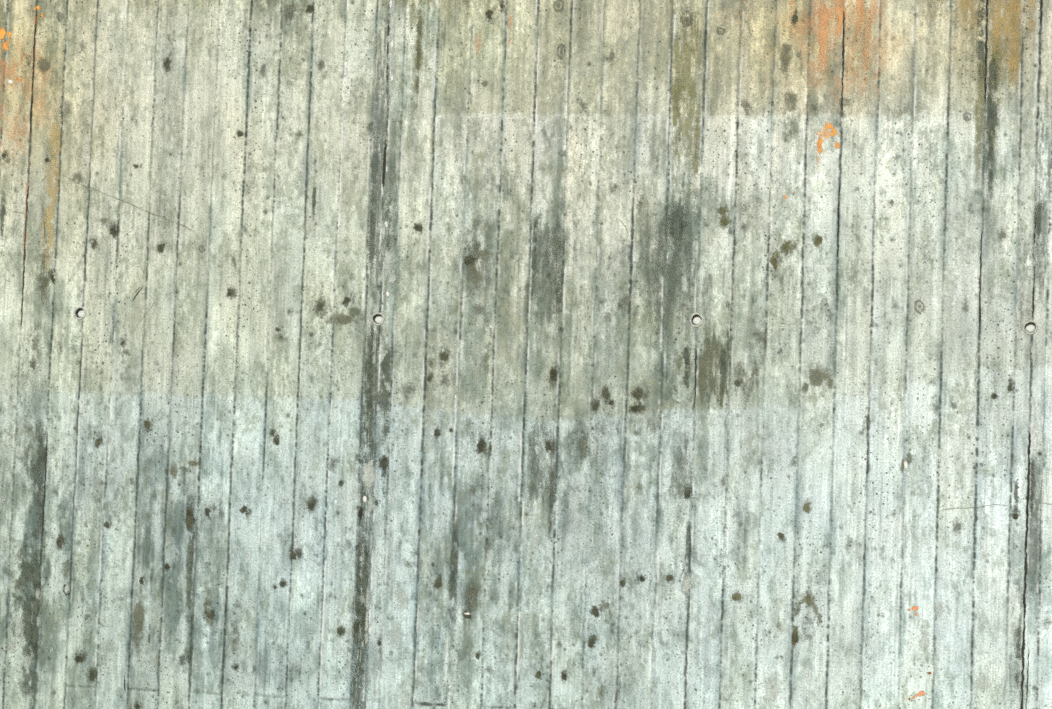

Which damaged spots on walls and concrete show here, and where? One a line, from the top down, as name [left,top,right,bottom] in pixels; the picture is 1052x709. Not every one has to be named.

rust [820,0,863,62]
rust [962,0,1034,190]
damp [368,34,395,280]
rust [817,123,840,154]
damp [531,216,561,313]
damp [655,205,691,283]
damp [315,297,358,324]
damp [676,332,758,407]
damp [25,428,46,506]
damp [337,326,391,709]
damp [13,525,44,695]